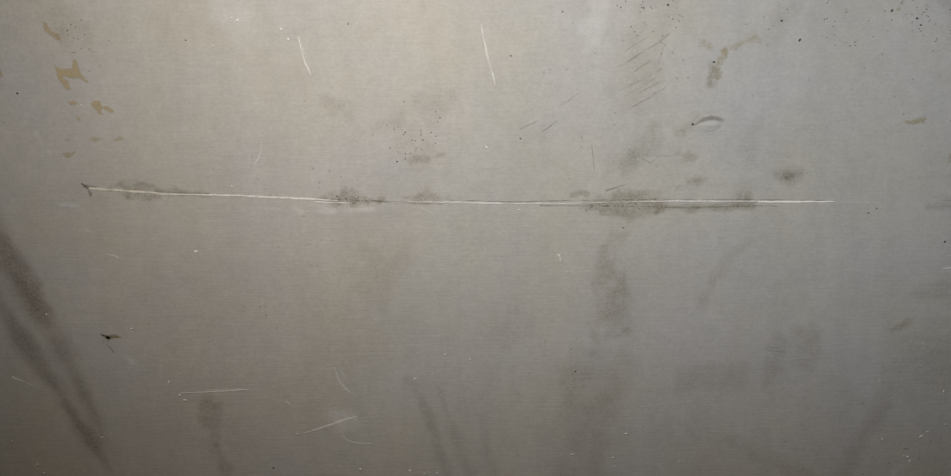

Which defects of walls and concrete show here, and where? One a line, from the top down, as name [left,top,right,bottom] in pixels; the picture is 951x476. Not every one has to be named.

crack [89,188,347,204]
crack [392,198,834,206]